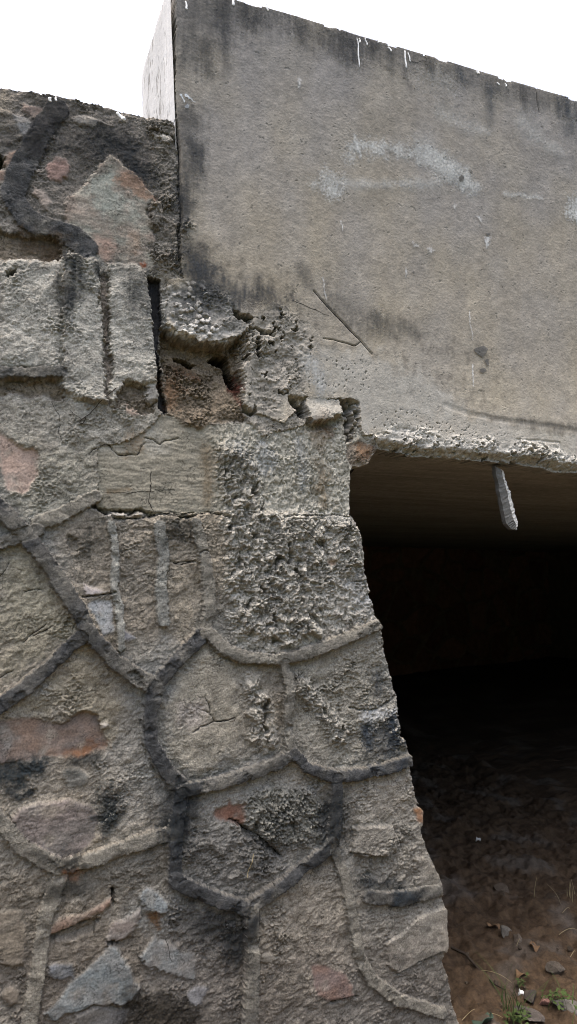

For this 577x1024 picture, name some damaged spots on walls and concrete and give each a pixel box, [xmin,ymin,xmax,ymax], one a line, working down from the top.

leakage [347,135,479,192]
spalling [98,268,321,430]
spalling [339,397,577,477]